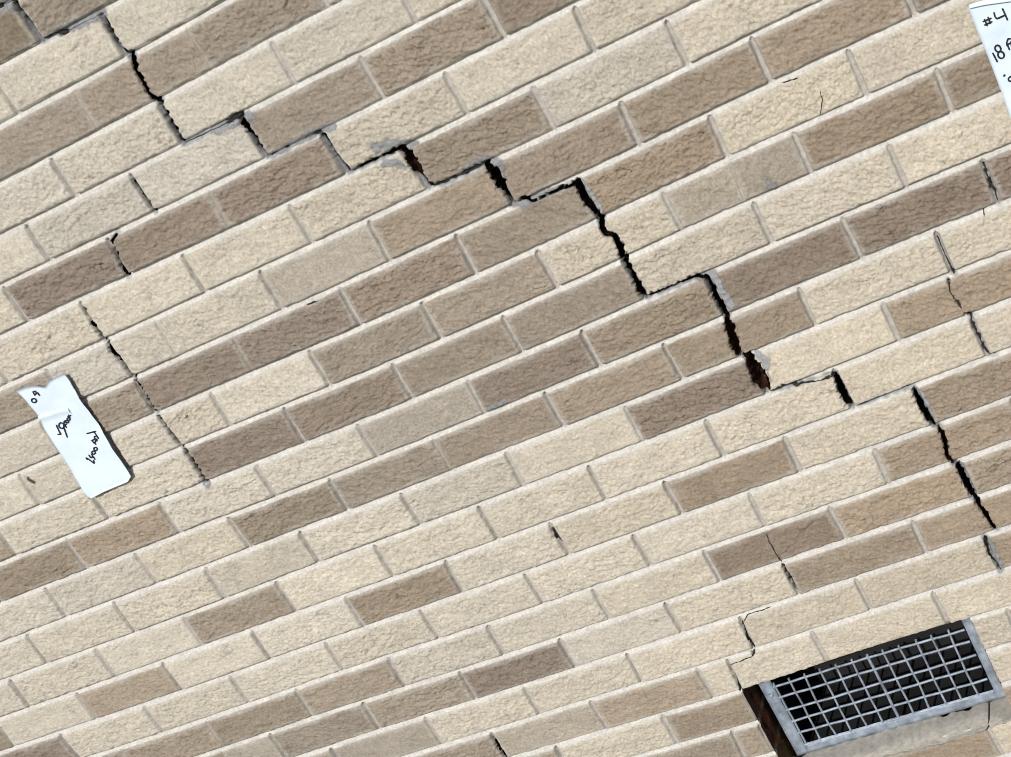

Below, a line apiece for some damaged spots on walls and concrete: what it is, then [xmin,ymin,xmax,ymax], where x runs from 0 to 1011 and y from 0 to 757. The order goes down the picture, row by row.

crack [0,0,1001,569]
crack [766,533,798,589]
crack [731,607,770,691]